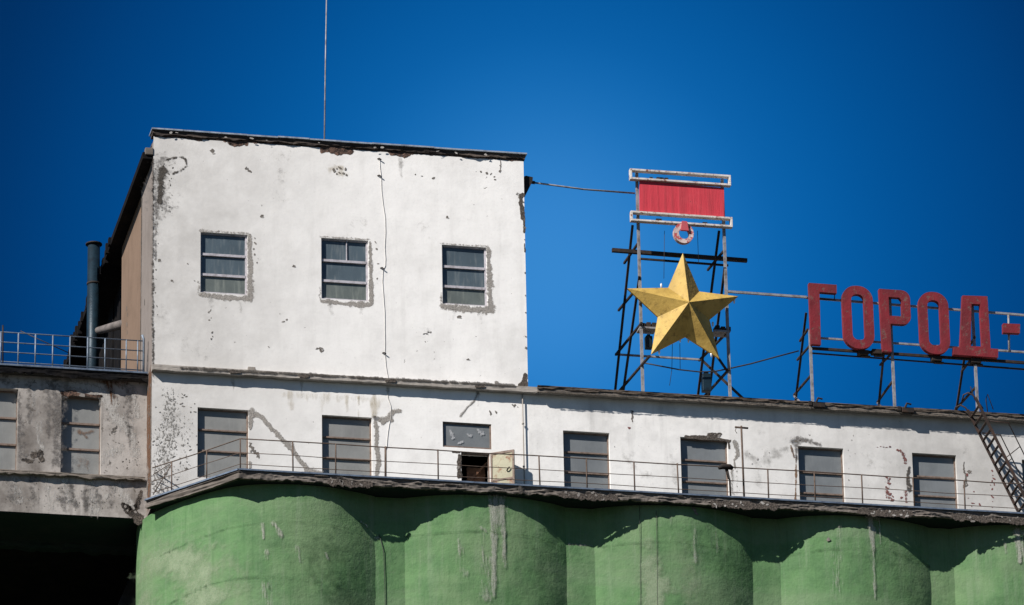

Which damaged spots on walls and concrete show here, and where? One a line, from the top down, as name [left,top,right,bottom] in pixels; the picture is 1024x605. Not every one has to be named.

spalling [151,132,522,180]
damp [44,378,67,468]
damp [5,477,120,509]
peeling [43,381,197,525]
spalling [558,491,618,501]
damp [480,495,506,600]